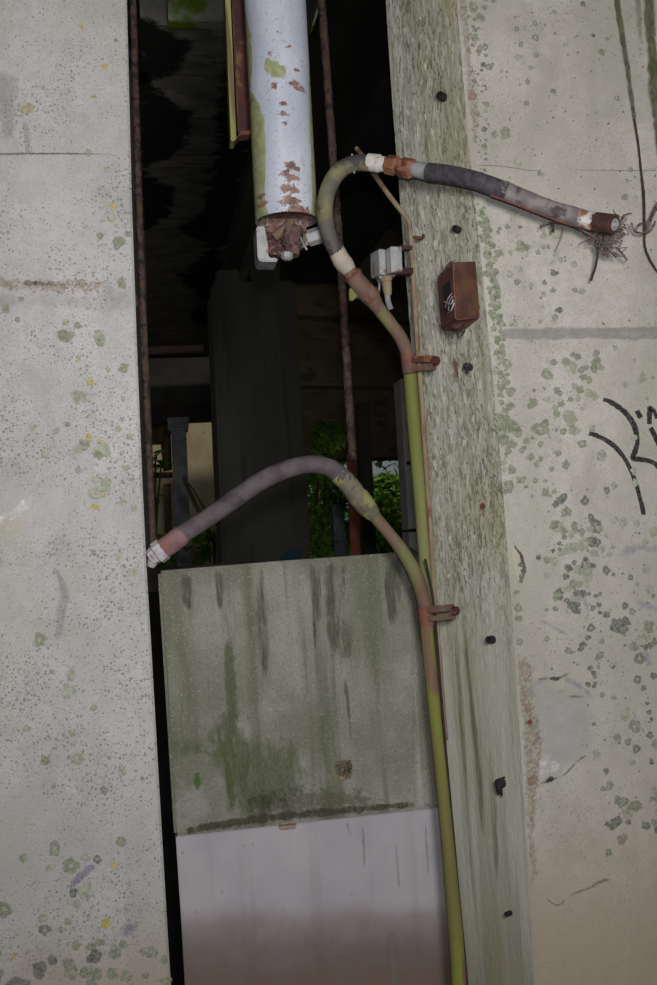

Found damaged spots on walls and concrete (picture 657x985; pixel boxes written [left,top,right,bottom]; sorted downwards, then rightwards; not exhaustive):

damp [615,0,637,135]
damp [644,0,657,145]
corrosion [0,279,105,292]
damp [502,327,657,339]
damp [216,579,236,733]
damp [313,566,350,668]